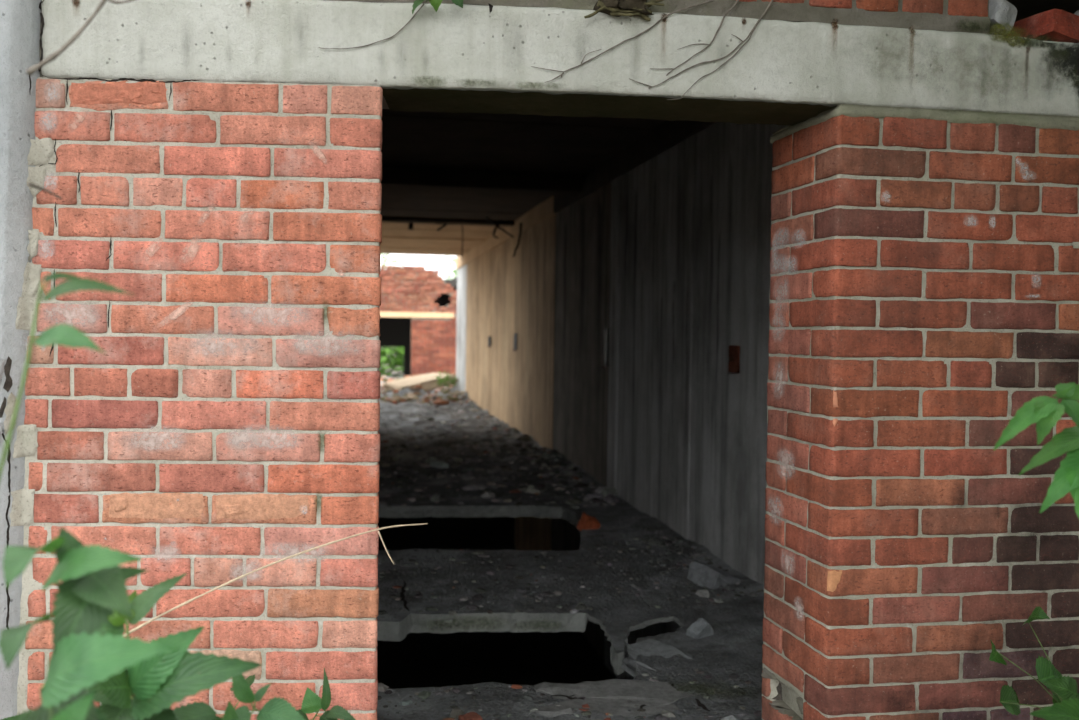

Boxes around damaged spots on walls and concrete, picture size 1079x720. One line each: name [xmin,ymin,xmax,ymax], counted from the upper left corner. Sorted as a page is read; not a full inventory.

crack [2,433,11,546]
crack [4,589,12,628]
spalling [761,667,803,720]